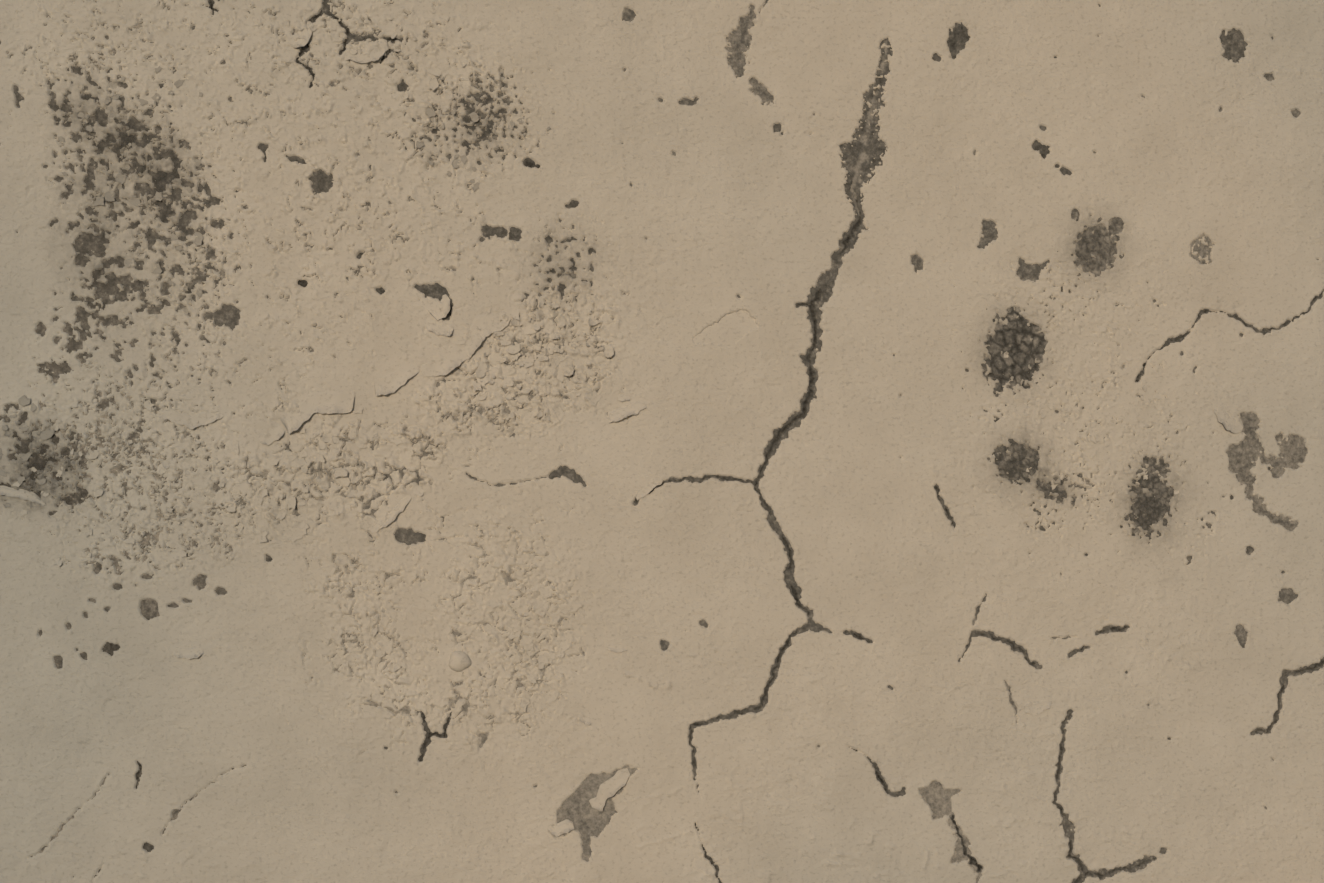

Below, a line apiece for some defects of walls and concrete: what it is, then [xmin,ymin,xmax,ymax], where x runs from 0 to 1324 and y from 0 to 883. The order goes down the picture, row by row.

peeling [725,0,774,105]
peeling [0,0,631,620]
crack [1135,289,1324,382]
crack [633,38,893,883]
peeling [1226,412,1308,531]
peeling [80,642,120,660]
peeling [304,512,585,748]
crack [958,594,1130,723]
crack [1250,657,1324,735]
peeling [548,765,638,862]
crack [849,747,906,797]
crack [1052,709,1157,883]